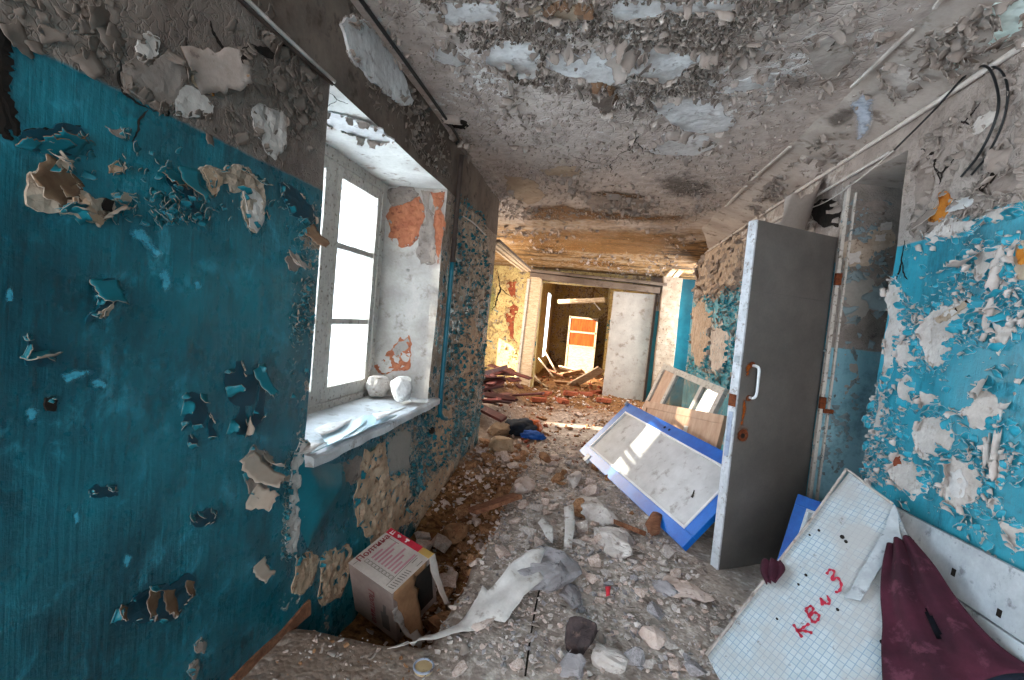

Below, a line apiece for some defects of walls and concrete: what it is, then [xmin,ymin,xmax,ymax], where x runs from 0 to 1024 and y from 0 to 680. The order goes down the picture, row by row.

peeling [15,122,353,606]
flaking render [341,186,519,544]
peeling [0,0,918,278]
damp [514,205,683,266]
damp [593,191,642,199]
peeling [685,0,1024,555]
spalling [111,573,196,626]
peeling [481,432,667,586]